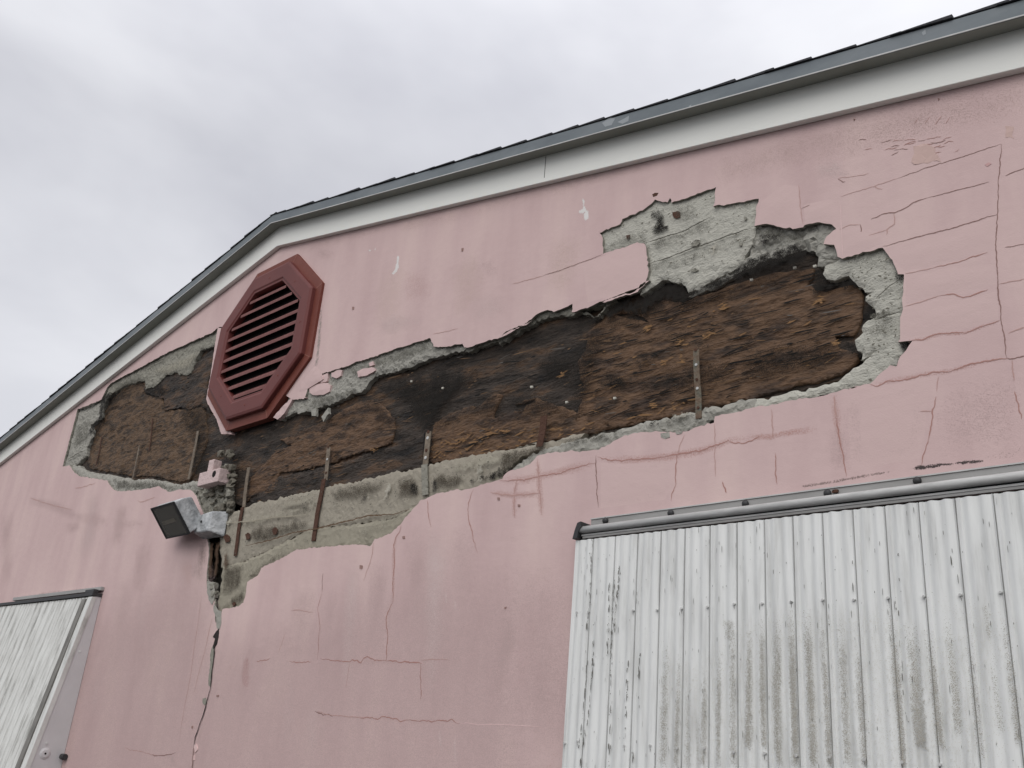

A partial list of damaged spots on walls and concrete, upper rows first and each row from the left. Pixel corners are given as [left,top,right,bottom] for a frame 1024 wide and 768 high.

crack [822,136,1024,475]
water stain [330,477,420,506]
spalling [65,190,911,611]
water stain [432,443,548,492]
crack [468,410,777,551]
crack [126,597,222,768]
crack [257,528,538,727]